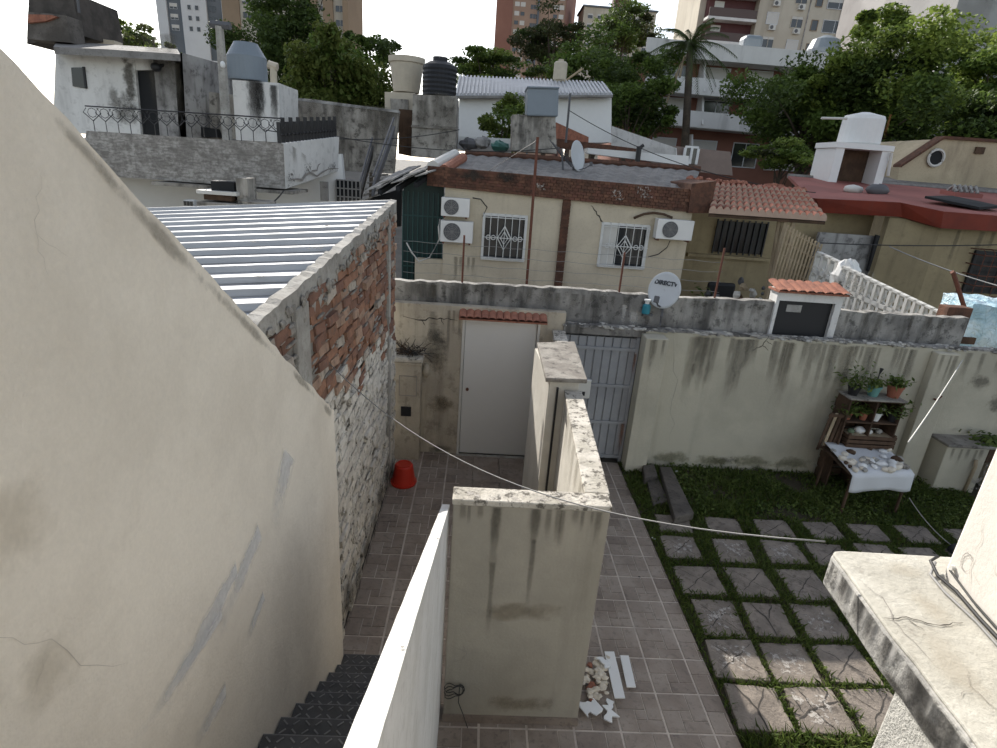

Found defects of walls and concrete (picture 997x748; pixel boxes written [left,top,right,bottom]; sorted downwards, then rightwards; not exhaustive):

spalling [248,199,397,346]
crack [662,517,887,732]
leakage [828,562,847,596]
leakage [853,595,874,634]
leakage [880,636,895,661]
crack [859,579,954,657]
leakage [886,668,968,748]